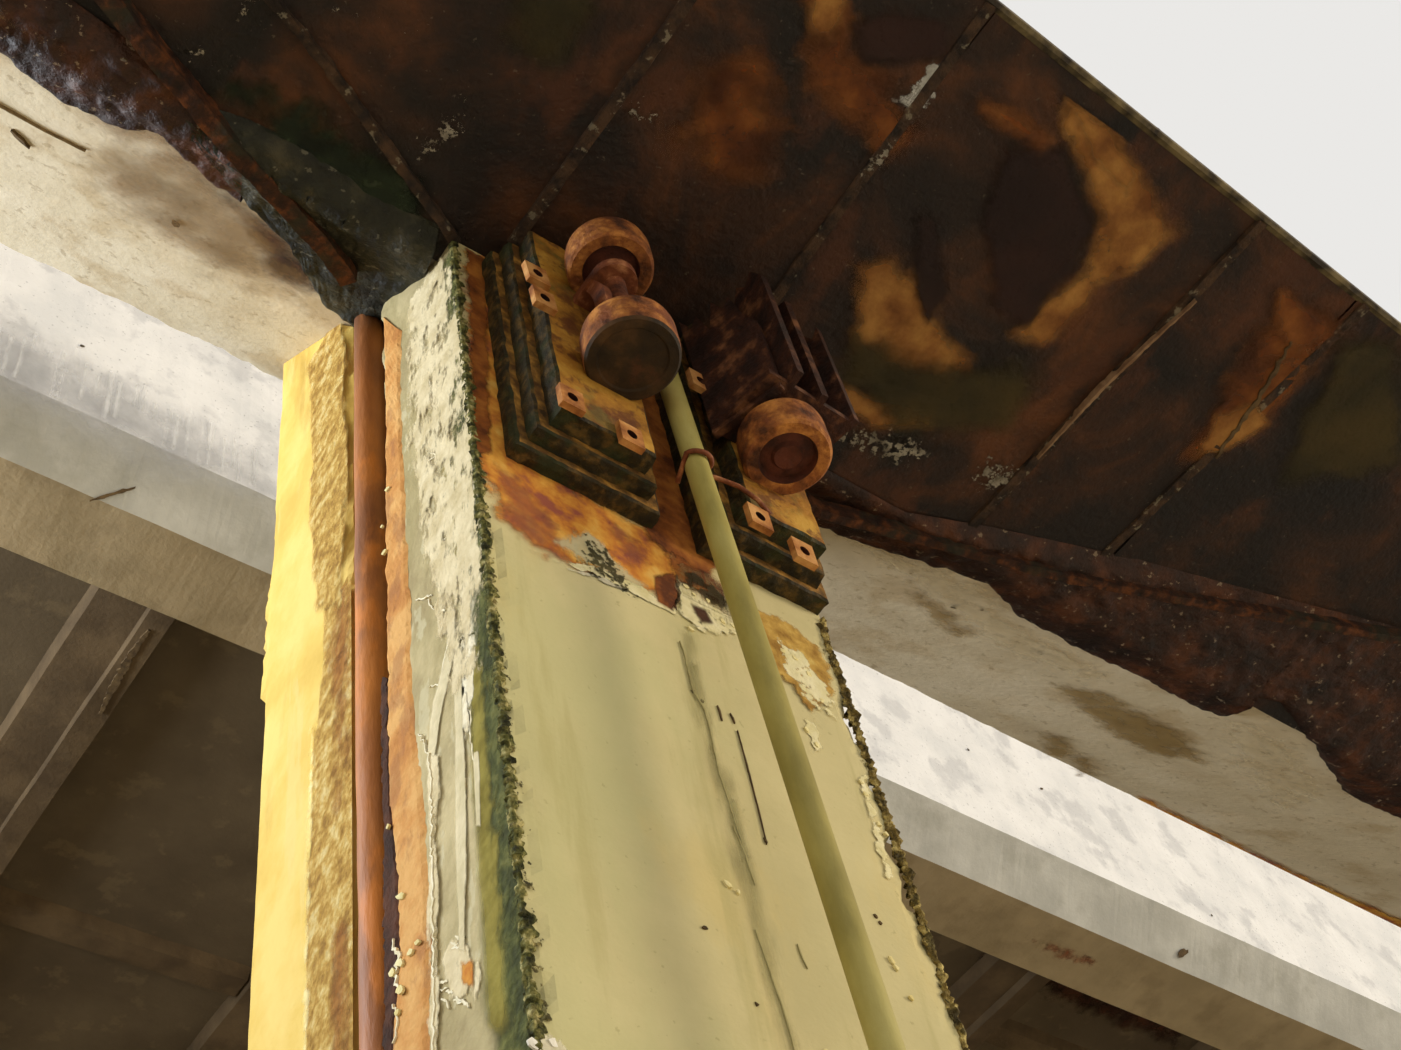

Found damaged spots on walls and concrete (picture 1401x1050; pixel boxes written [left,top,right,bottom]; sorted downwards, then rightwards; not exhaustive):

crack [0,104,86,152]
water stain [105,123,315,291]
rust [463,248,728,613]
rust [839,387,929,467]
spalling [557,534,737,636]
water stain [875,551,1098,676]
rust [306,314,389,1050]
water stain [1045,736,1091,776]
water stain [1059,688,1198,762]
spalling [758,610,970,1050]